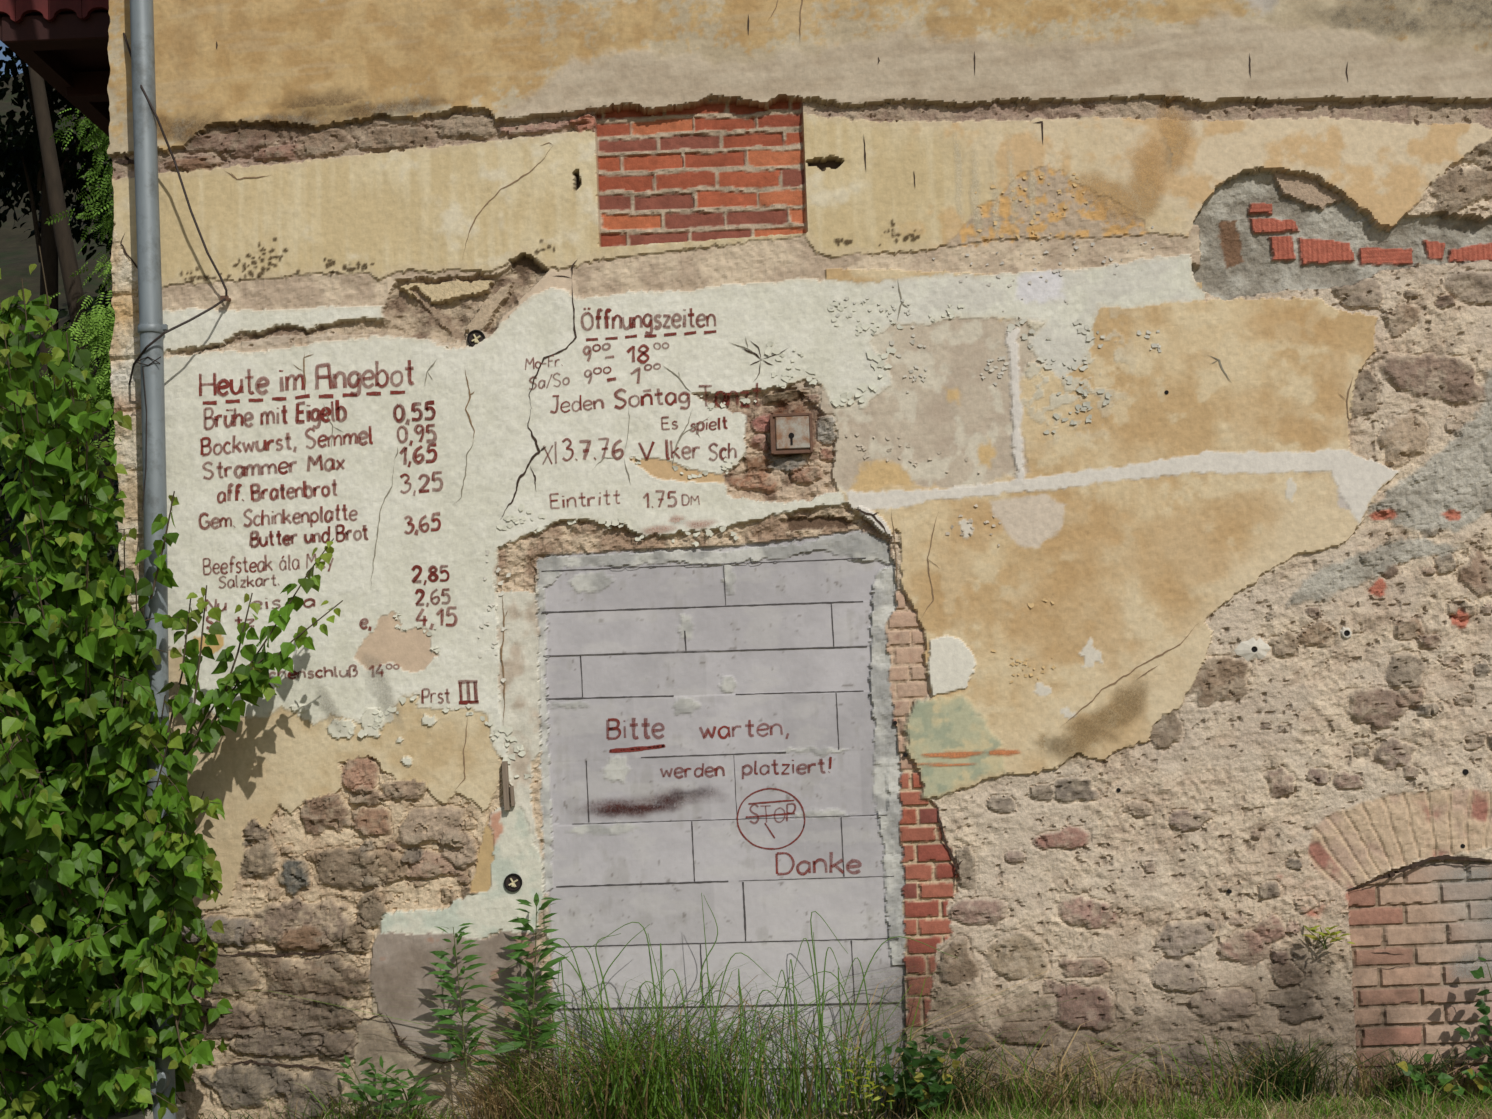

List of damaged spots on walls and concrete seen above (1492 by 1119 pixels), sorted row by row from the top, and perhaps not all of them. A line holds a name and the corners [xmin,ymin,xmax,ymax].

flaking render [158,110,598,173]
crack [464,142,553,251]
flaking render [478,285,965,658]
crack [1063,625,1196,725]
flaking render [801,97,1492,1118]
flaking render [176,703,546,1119]
flaking render [536,911,557,1119]